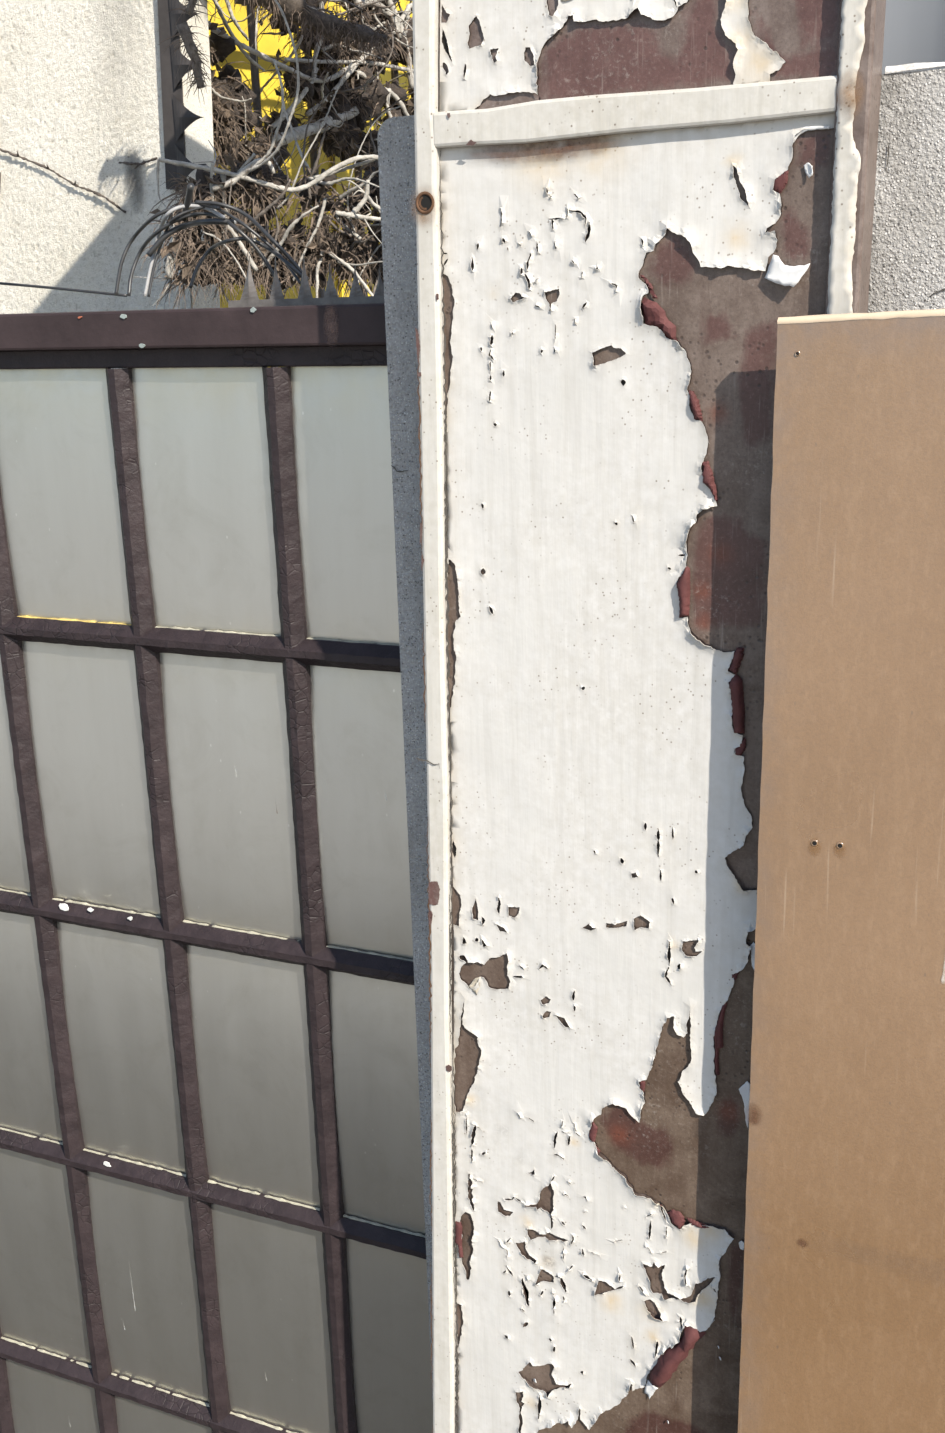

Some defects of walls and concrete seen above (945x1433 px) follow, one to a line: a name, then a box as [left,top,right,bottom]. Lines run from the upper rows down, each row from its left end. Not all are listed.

peeling [476,0,738,109]
peeling [749,0,840,81]
peeling [546,289,560,307]
peeling [593,345,626,366]
peeling [639,126,834,889]
peeling [460,953,522,995]
peeling [446,1007,481,1111]
peeling [455,1125,476,1278]
peeling [504,1176,584,1306]
peeling [537,929,756,1433]
peeling [519,1362,571,1394]